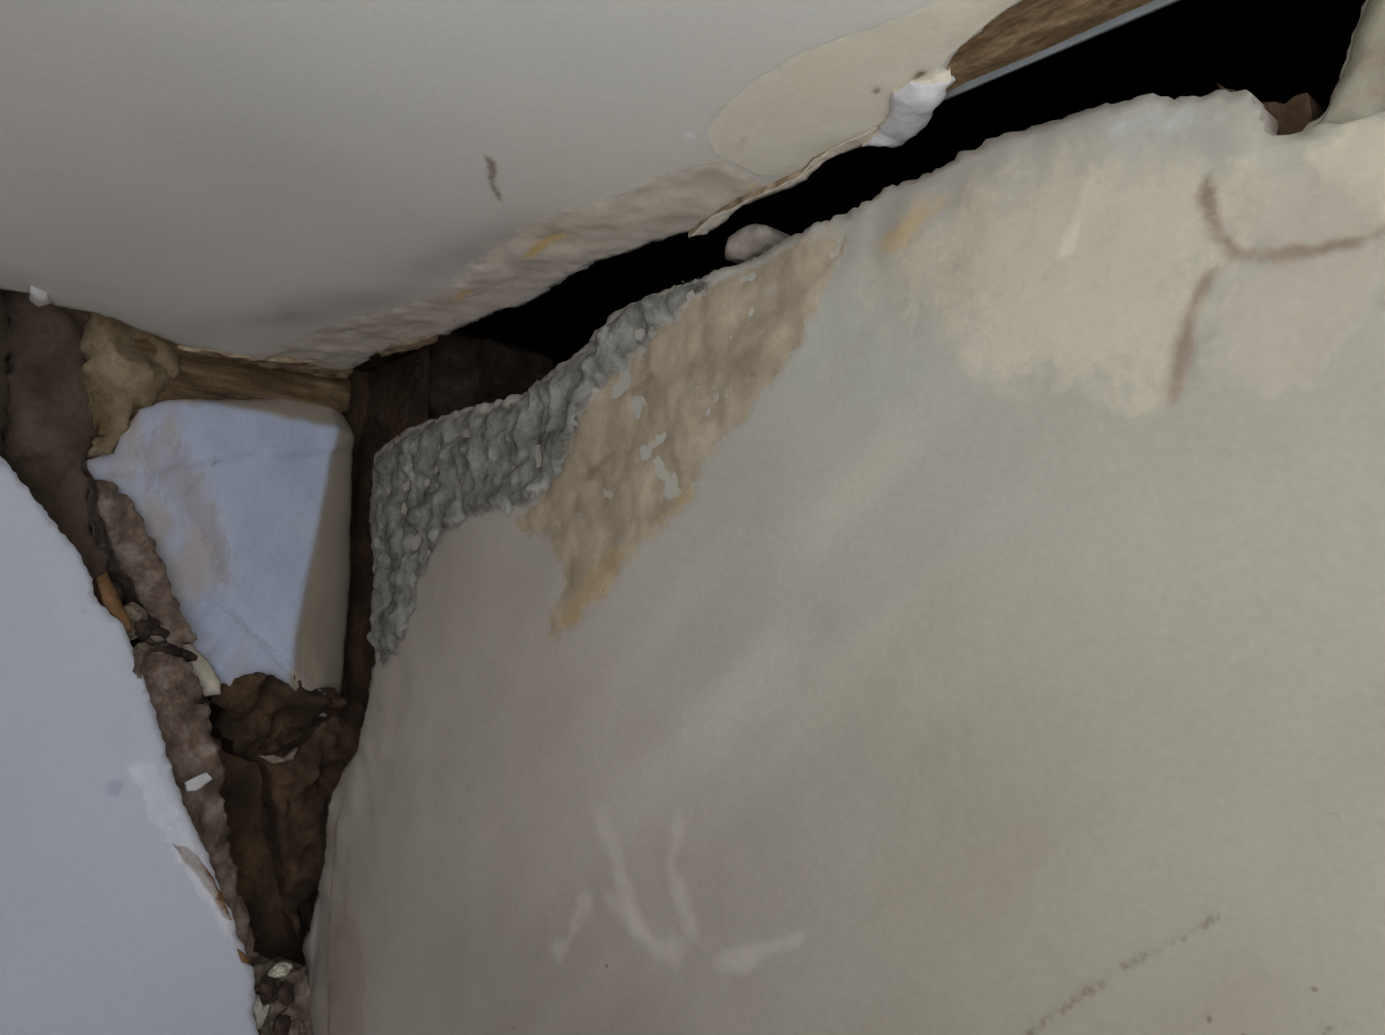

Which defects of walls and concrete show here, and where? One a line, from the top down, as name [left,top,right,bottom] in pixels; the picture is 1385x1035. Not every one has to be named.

flaking render [1312,0,1385,129]
flaking render [0,125,878,1035]